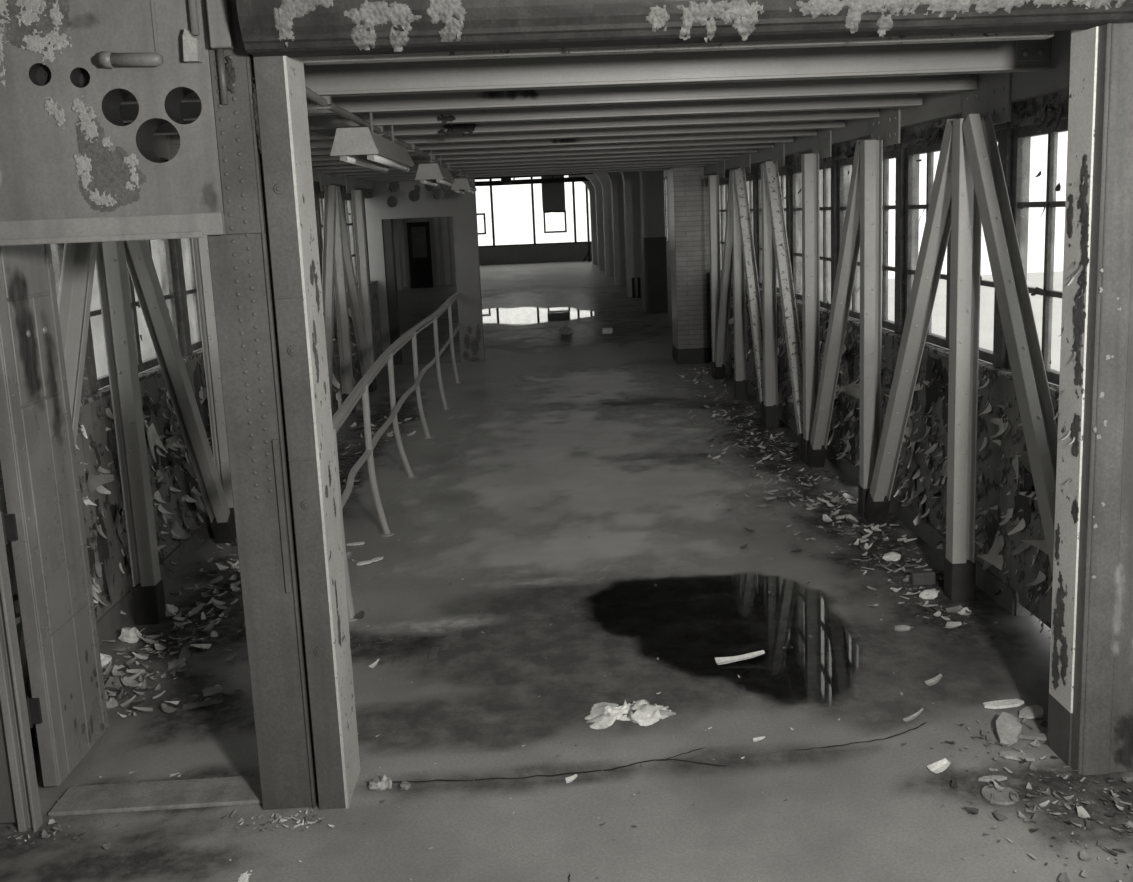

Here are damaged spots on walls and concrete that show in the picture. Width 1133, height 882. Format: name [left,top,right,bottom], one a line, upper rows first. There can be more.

peeling [0,0,72,87]
peeling [273,0,467,52]
peeling [646,0,764,43]
peeling [789,0,1126,39]
peeling [44,96,147,212]
peeling [1054,154,1107,457]
peeling [76,406,132,621]
peeling [143,387,208,572]
peeling [191,361,212,448]
peeling [827,326,860,478]
peeling [894,354,949,549]
peeling [12,594,21,636]